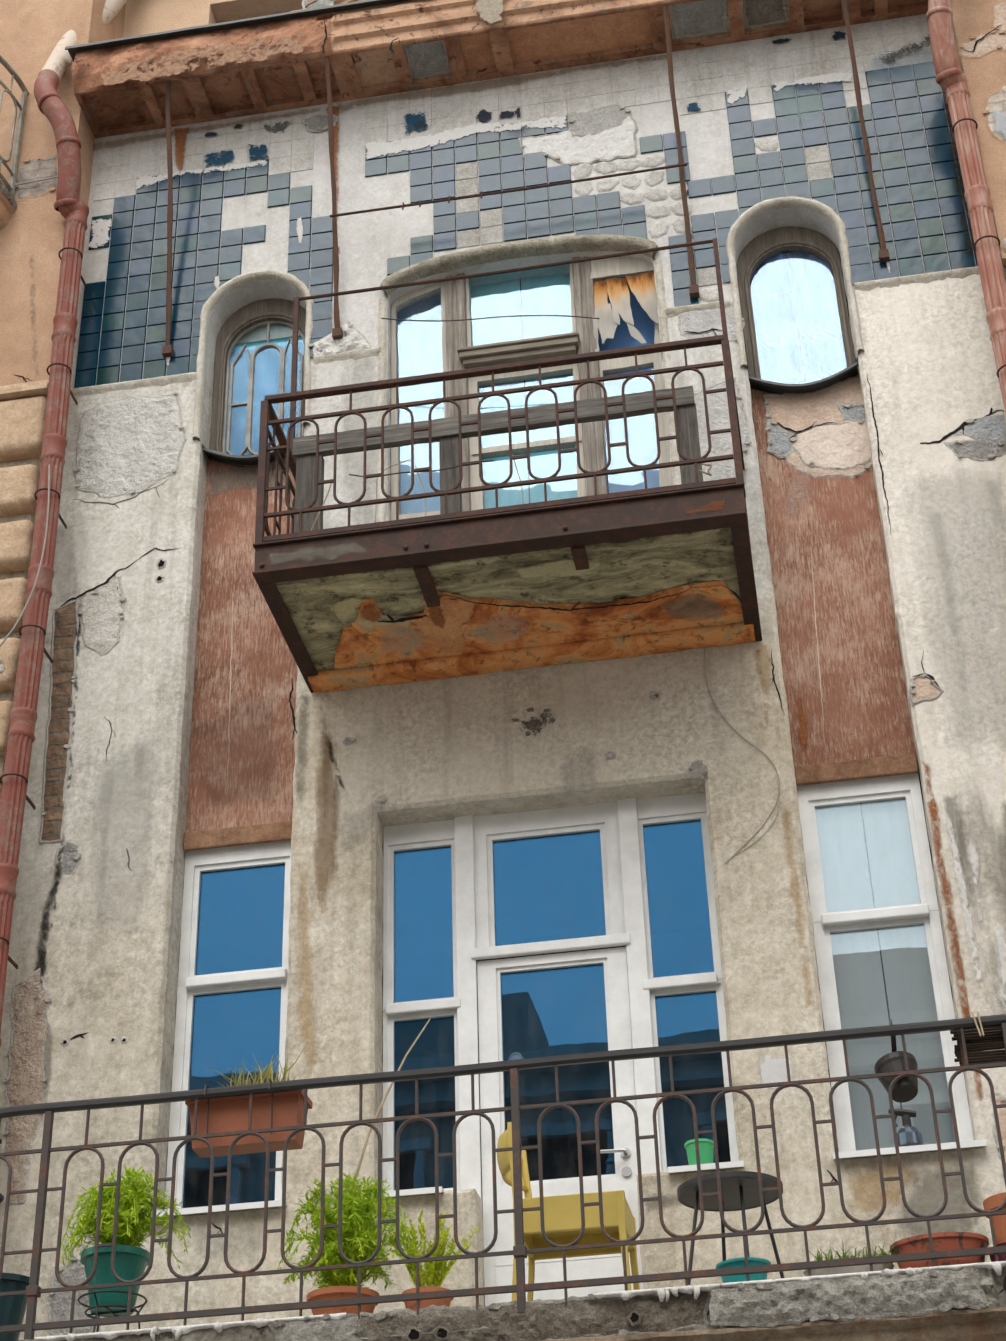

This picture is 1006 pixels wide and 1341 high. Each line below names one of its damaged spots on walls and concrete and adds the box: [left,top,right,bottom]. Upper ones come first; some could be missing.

peeling [101,35,303,85]
peeling [135,114,338,190]
flaking render [364,104,638,165]
flaking render [694,377,873,484]
crack [867,377,891,533]
crack [920,407,1003,444]
crack [60,548,178,609]
flaking render [38,575,126,845]
rust [925,765,970,1018]
damp [946,798,981,979]
damp [996,929,1006,1012]
spalling [1,968,52,1208]